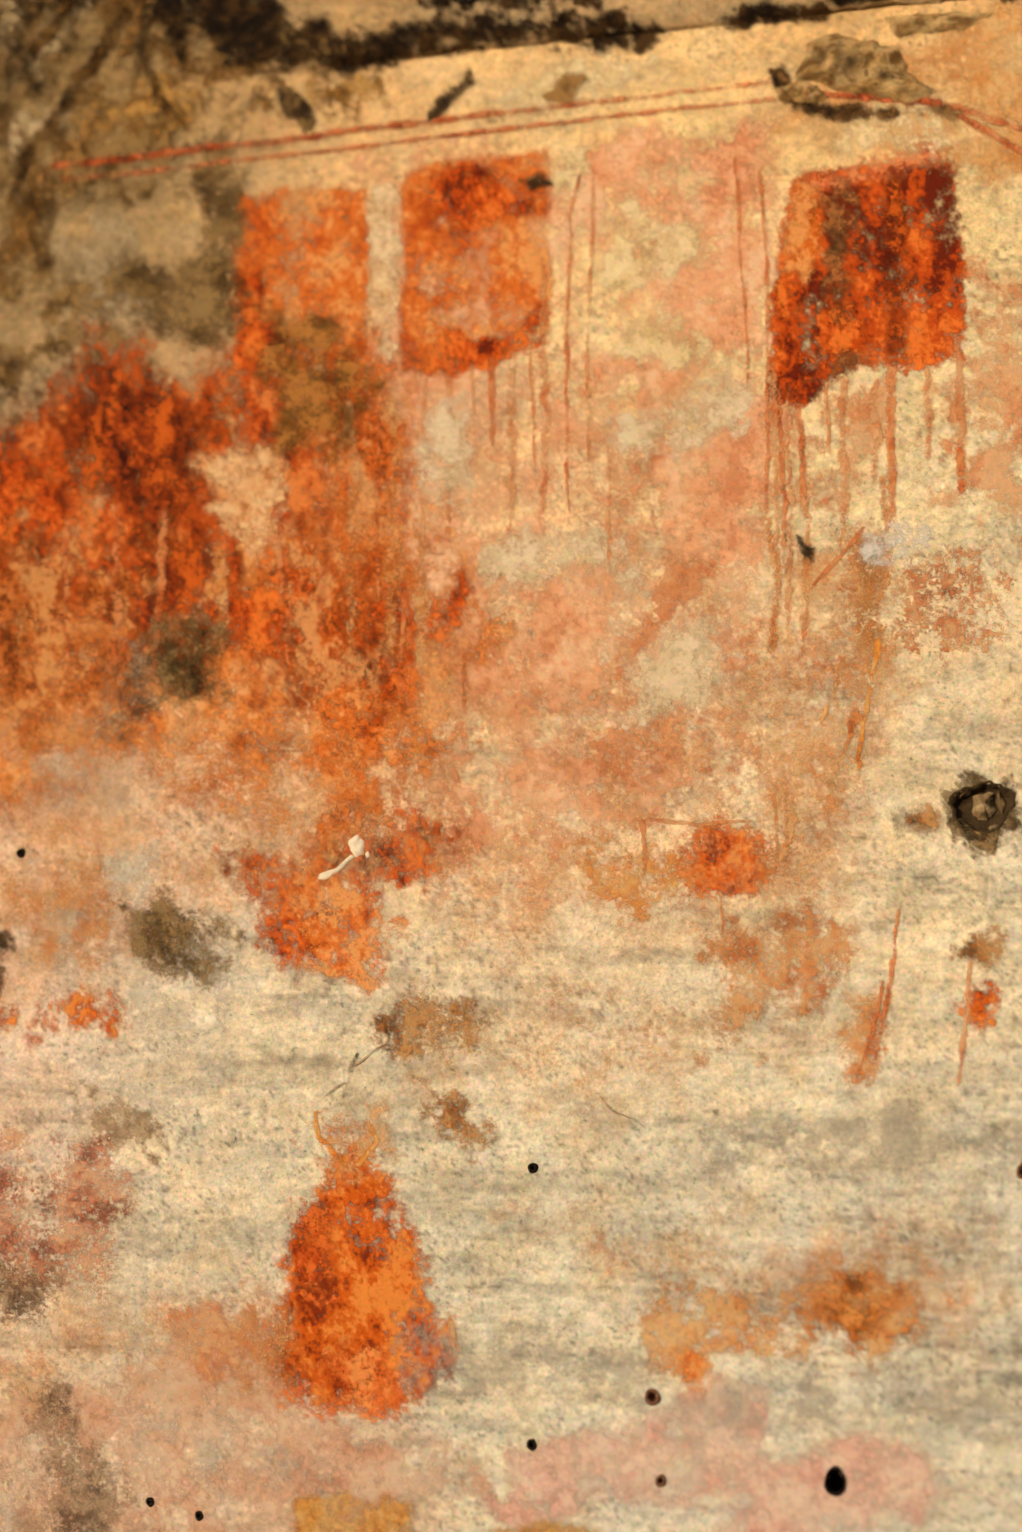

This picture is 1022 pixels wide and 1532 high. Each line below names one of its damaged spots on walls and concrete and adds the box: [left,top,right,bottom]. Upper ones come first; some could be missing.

damp [722,0,877,29]
damp [0,0,663,504]
corrosion [0,152,554,994]
corrosion [529,141,1012,1041]
corrosion [0,985,125,1043]
damp [120,888,243,985]
corrosion [839,909,900,1084]
corrosion [951,925,1007,1083]
corrosion [235,1106,459,1423]
corrosion [641,1249,935,1397]